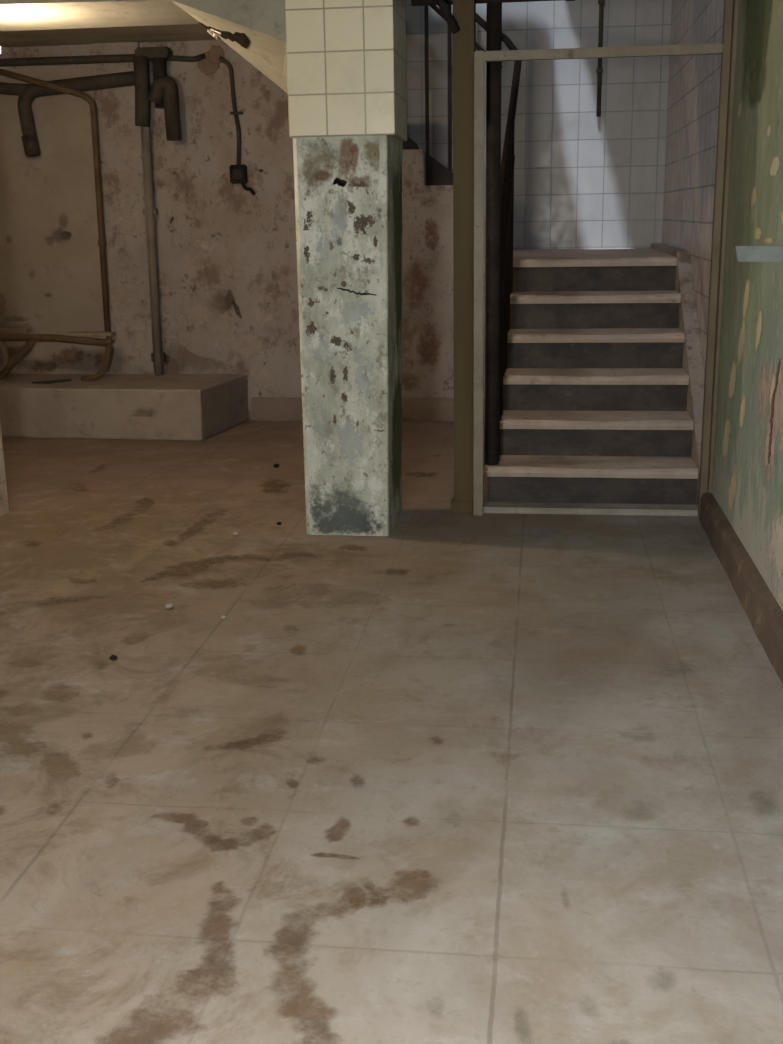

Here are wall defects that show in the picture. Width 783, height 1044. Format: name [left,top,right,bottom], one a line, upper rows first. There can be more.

peeling [722,277,762,460]
crack [752,347,783,487]
water stain [314,485,381,533]
water stain [142,553,313,588]
peeling [760,514,783,606]